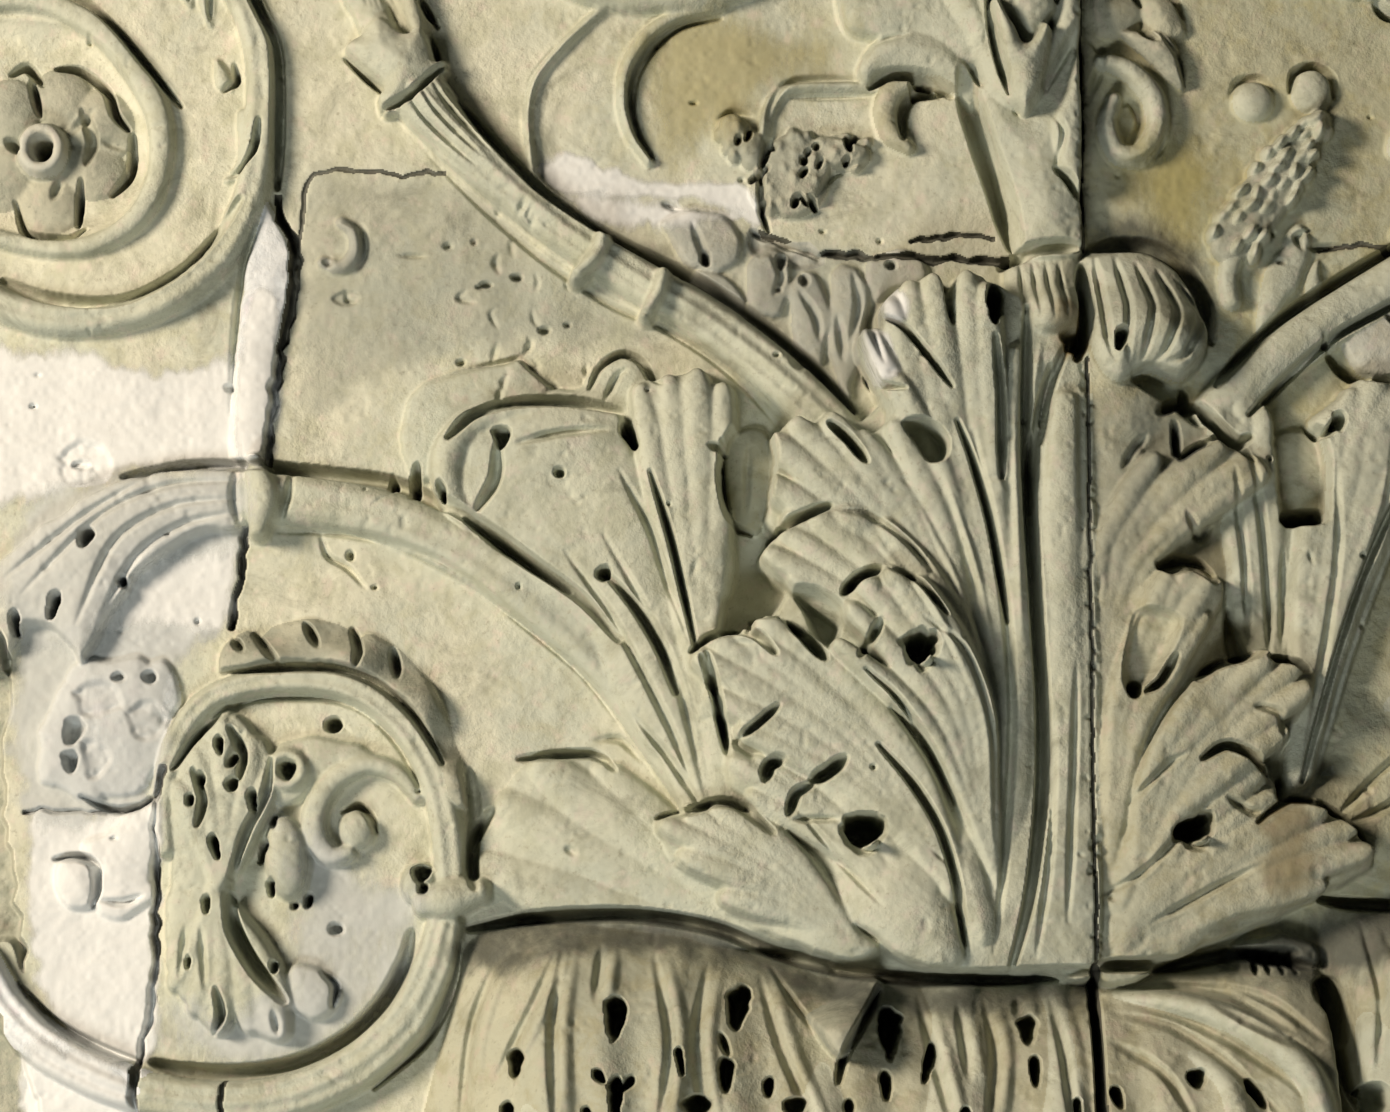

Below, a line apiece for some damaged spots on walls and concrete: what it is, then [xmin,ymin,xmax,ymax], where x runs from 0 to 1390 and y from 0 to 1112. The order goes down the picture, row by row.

crack [758,229,1010,270]
crack [257,167,446,468]
crack [228,526,250,631]
crack [22,808,58,816]
crack [91,764,167,1002]
crack [127,1059,144,1112]
crack [217,1081,228,1112]